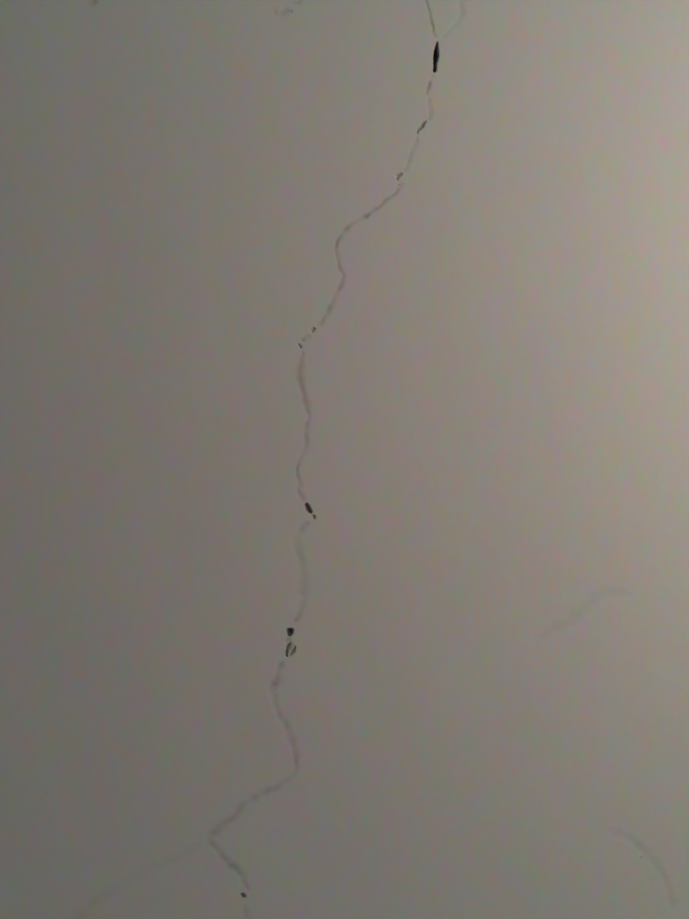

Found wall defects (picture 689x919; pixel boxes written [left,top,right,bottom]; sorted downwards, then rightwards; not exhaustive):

crack [62,0,468,919]